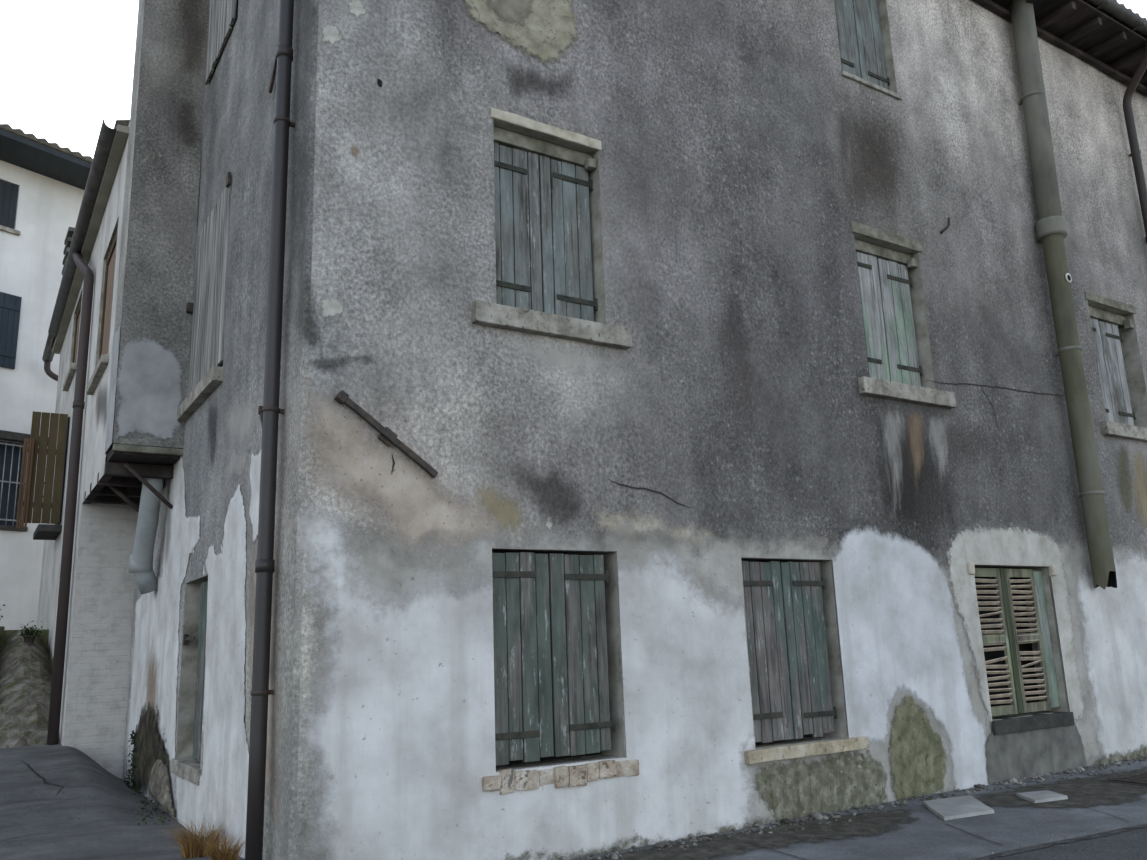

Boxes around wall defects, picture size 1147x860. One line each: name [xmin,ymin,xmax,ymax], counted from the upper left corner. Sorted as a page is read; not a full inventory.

spalling [465,0,578,66]
leakage [910,416,922,468]
crack [926,380,1062,429]
peeling [312,399,508,608]
peeling [311,573,338,714]
peeling [527,513,955,825]
peeling [938,561,991,743]
peeling [1044,533,1103,766]
mould [131,705,171,807]
flaking render [149,759,178,817]
leakage [719,750,887,833]
leakage [506,837,661,860]